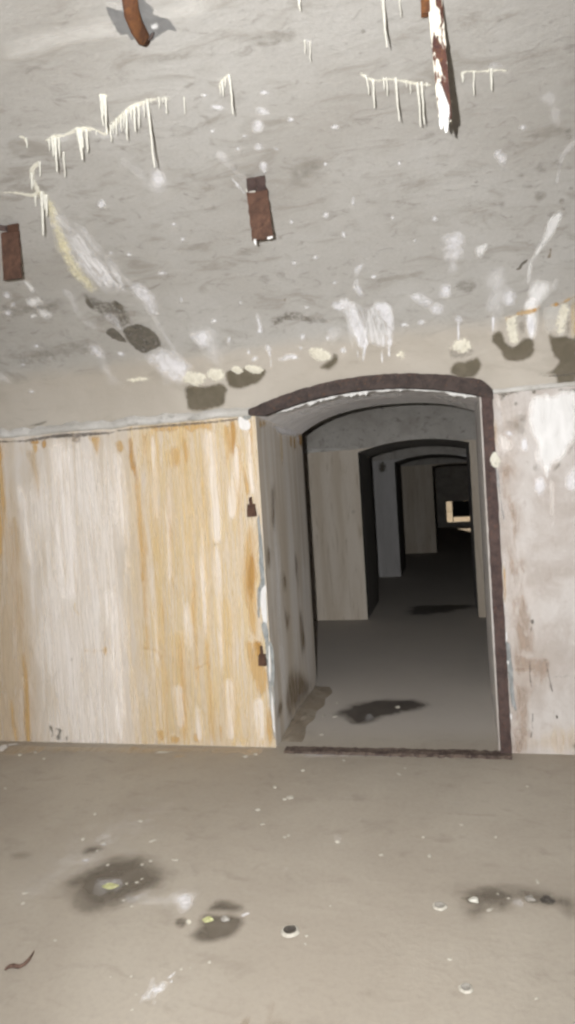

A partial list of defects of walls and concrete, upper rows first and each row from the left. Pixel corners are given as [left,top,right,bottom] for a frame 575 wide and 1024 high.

damp [438,82,450,125]
damp [25,281,51,318]
peeling [85,294,129,342]
damp [132,284,156,313]
damp [333,286,405,362]
damp [490,213,575,494]
corrosion [0,451,38,742]
corrosion [117,416,302,747]
damp [514,597,549,681]
damp [67,844,163,912]
damp [176,894,249,942]